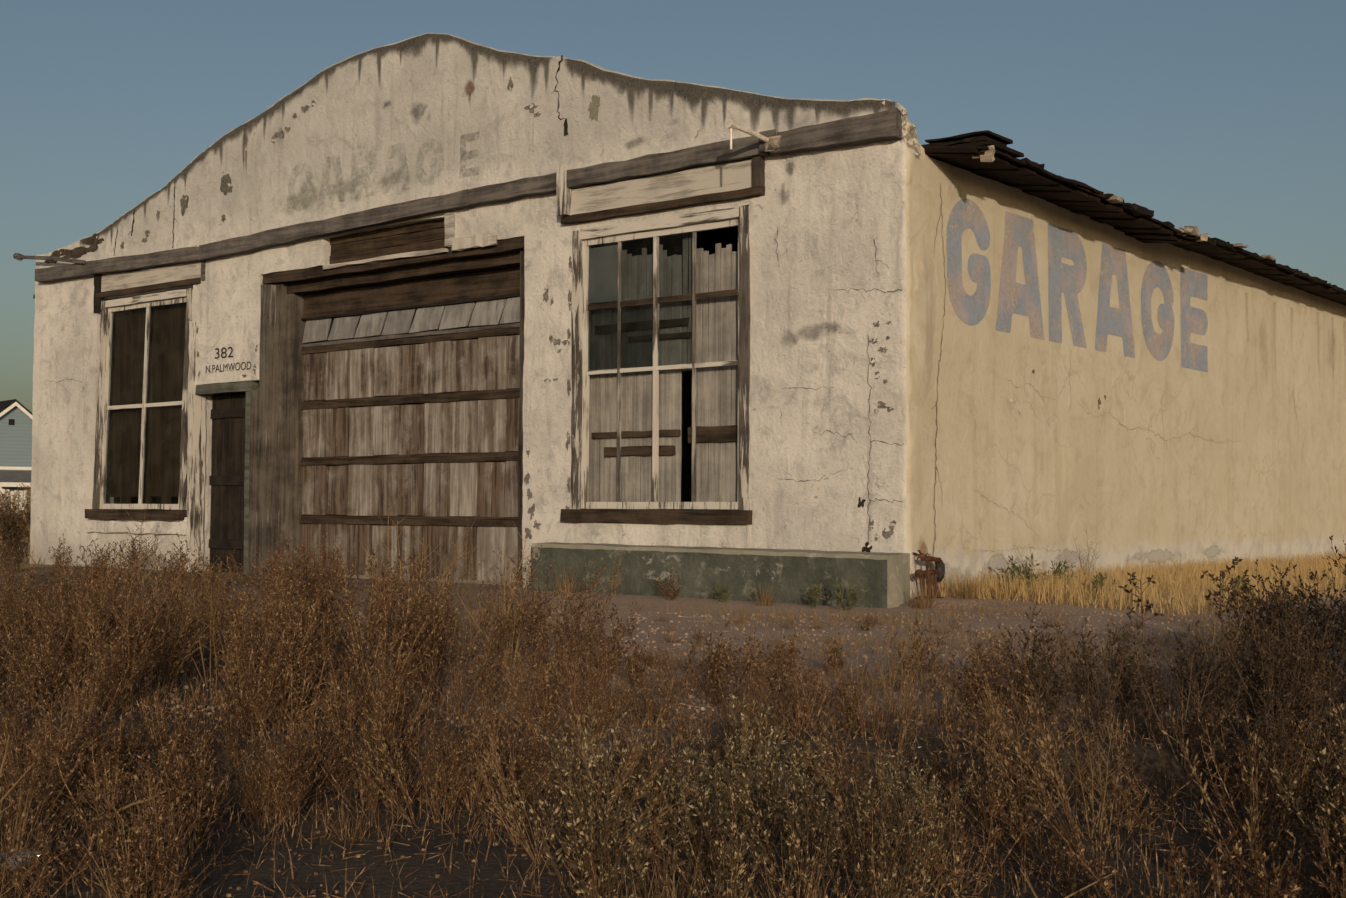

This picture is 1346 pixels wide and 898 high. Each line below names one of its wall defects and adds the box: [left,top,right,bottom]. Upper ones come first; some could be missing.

damp [80,34,895,245]
crack [552,55,568,136]
flaking render [543,289,572,311]
flaking render [549,329,571,353]
crack [778,183,946,565]
crack [1008,350,1239,465]
flaking render [524,447,541,539]
flaking render [867,520,896,547]